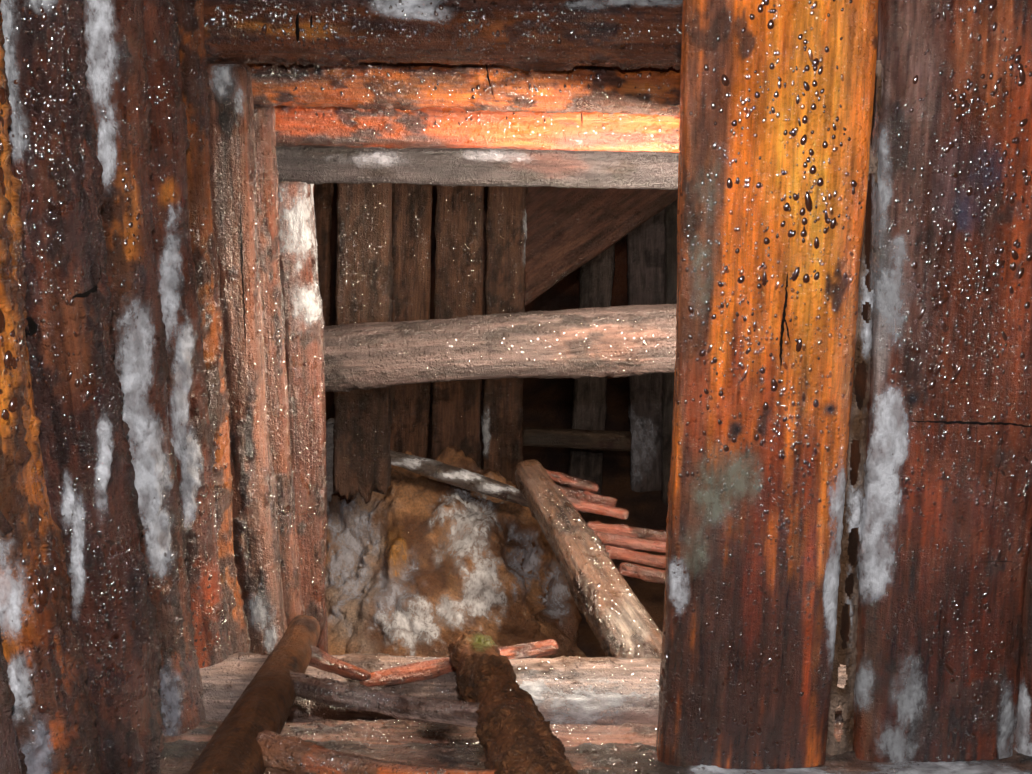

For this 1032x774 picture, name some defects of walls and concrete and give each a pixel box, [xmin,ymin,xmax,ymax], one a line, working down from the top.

damp [372,0,442,20]
damp [85,0,116,183]
damp [278,182,318,268]
damp [294,284,321,322]
crack [779,273,790,370]
damp [862,238,905,353]
damp [96,421,112,489]
damp [120,240,201,576]
damp [62,483,85,602]
damp [824,388,907,661]
damp [7,662,30,706]
mould [879,674,1032,774]